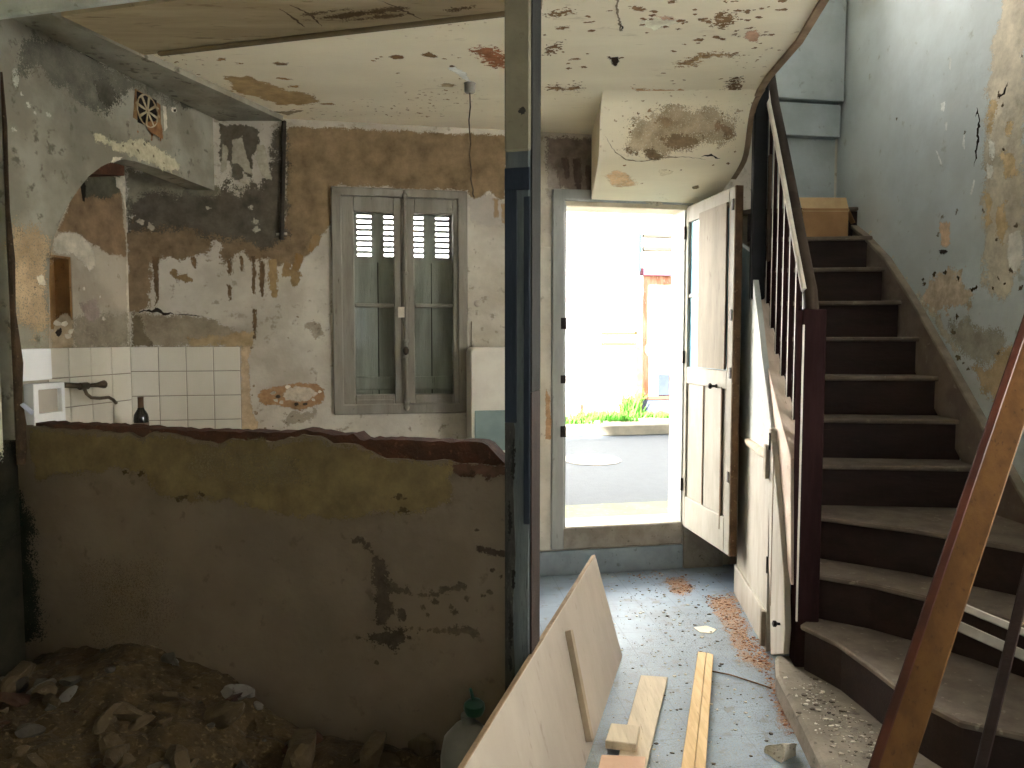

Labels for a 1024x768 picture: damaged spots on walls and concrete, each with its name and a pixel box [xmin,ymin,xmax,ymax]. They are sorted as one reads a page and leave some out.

peeling [541,7,596,91]
peeling [628,0,788,84]
peeling [94,133,181,173]
peeling [218,123,273,181]
crack [607,139,720,162]
leakage [621,103,742,165]
flaking render [921,0,1024,320]
crack [973,109,981,163]
peeling [115,175,126,212]
spalling [50,313,74,348]
spalling [240,338,325,430]